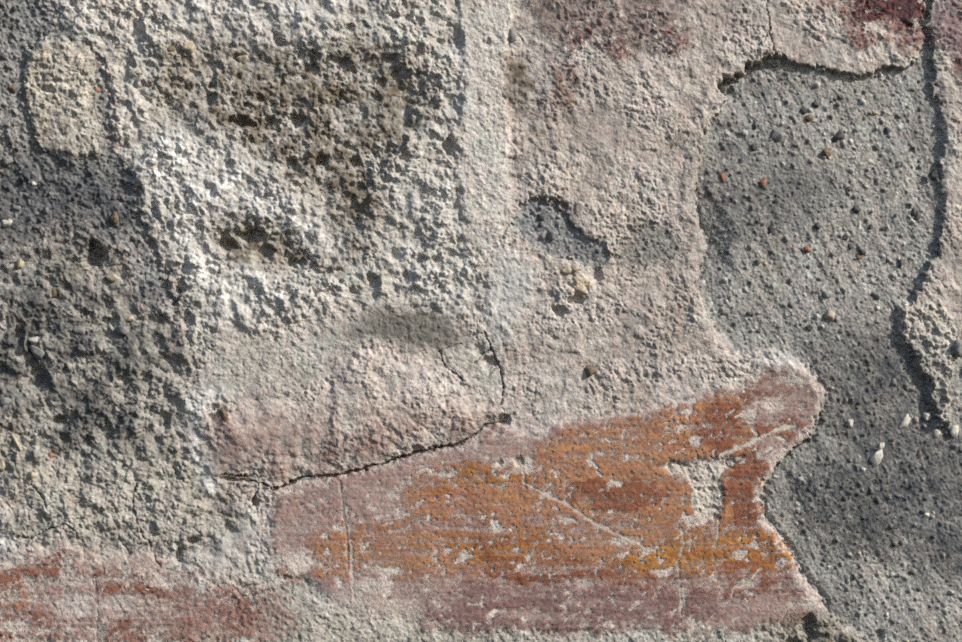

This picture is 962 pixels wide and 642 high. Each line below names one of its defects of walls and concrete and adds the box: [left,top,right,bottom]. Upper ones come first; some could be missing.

crack [215,421,505,497]
spalling [272,0,962,642]